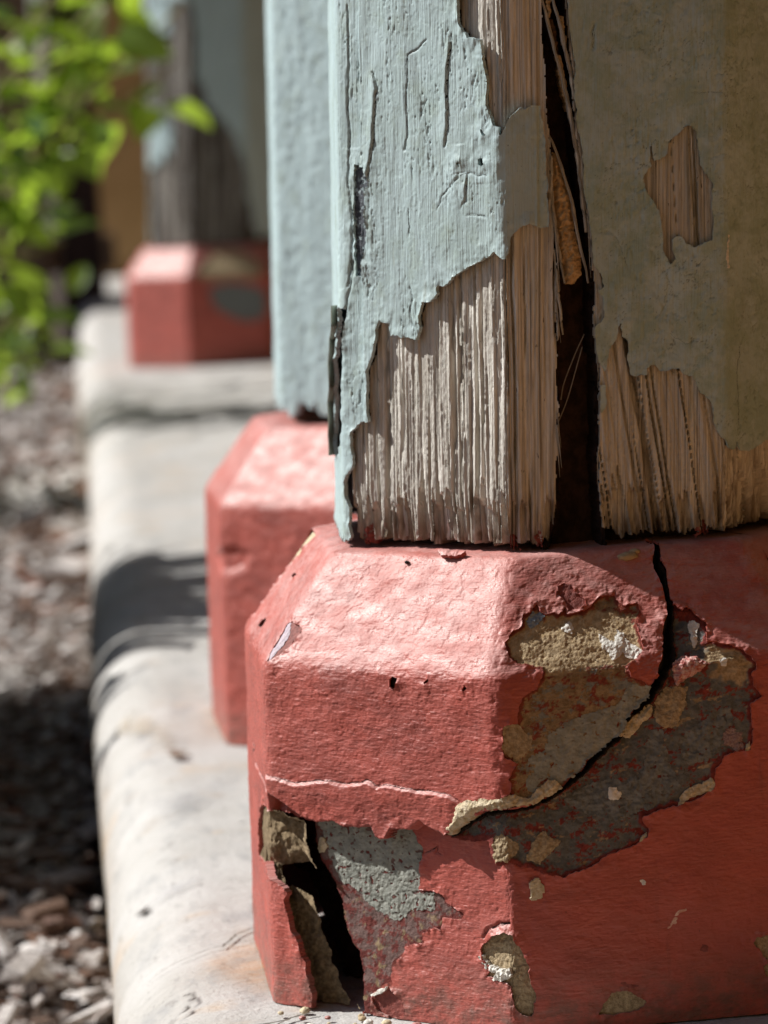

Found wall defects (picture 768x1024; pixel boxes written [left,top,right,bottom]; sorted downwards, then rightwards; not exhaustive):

peeling [327,305,338,456]
peeling [268,622,301,661]
crack [253,550,676,853]
spalling [446,581,761,901]
peeling [260,806,464,1018]
peeling [478,933,536,1016]